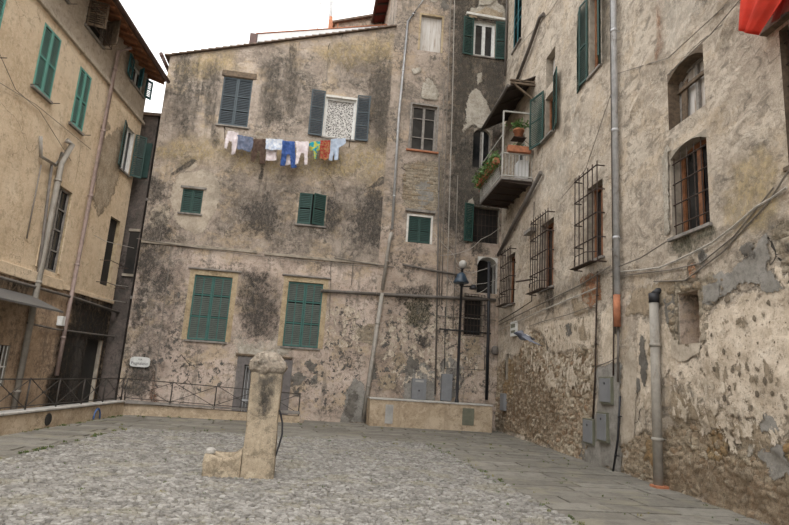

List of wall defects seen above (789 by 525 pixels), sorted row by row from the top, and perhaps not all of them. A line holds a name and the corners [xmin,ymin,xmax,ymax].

damp [157,55,290,173]
damp [263,45,297,124]
damp [295,68,391,180]
damp [130,176,173,329]
damp [240,192,282,239]
damp [326,190,383,248]
damp [119,355,155,399]
damp [238,272,292,357]
peeling [522,272,622,399]
peeling [625,249,789,462]